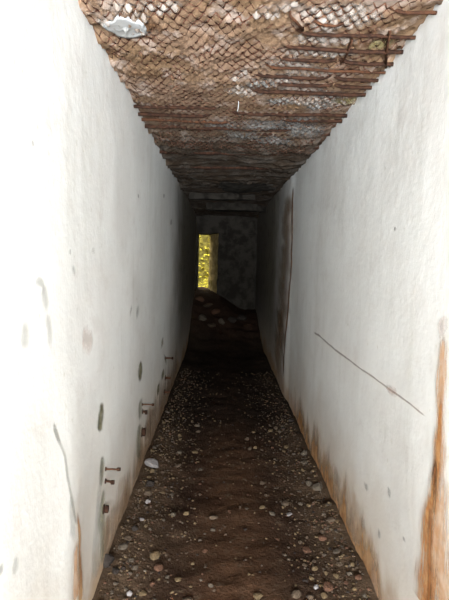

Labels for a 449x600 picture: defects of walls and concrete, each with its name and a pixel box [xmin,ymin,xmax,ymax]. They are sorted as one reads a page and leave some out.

flaking render [97,0,178,39]
spalling [205,1,382,145]
corrosion [275,192,293,371]
damp [99,460,109,560]
corrosion [296,409,379,599]
corrosion [417,339,449,600]